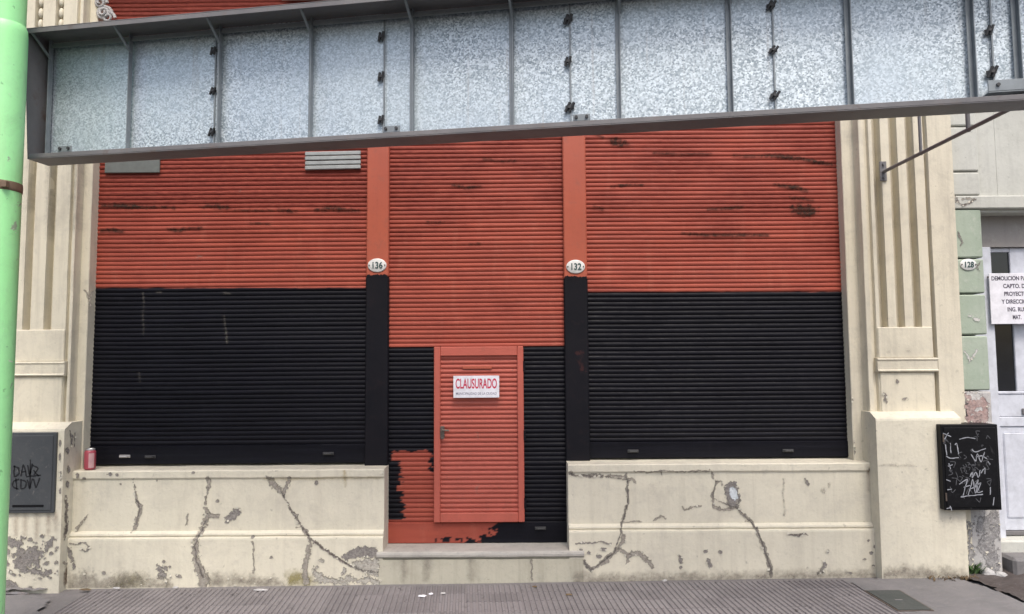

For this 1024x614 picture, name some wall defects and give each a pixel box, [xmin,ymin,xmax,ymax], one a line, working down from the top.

crack [130,482,143,533]
crack [185,477,220,587]
flaking render [224,506,242,523]
crack [266,476,378,585]
crack [569,469,807,577]
flaking render [6,533,91,592]
peeling [312,546,382,585]